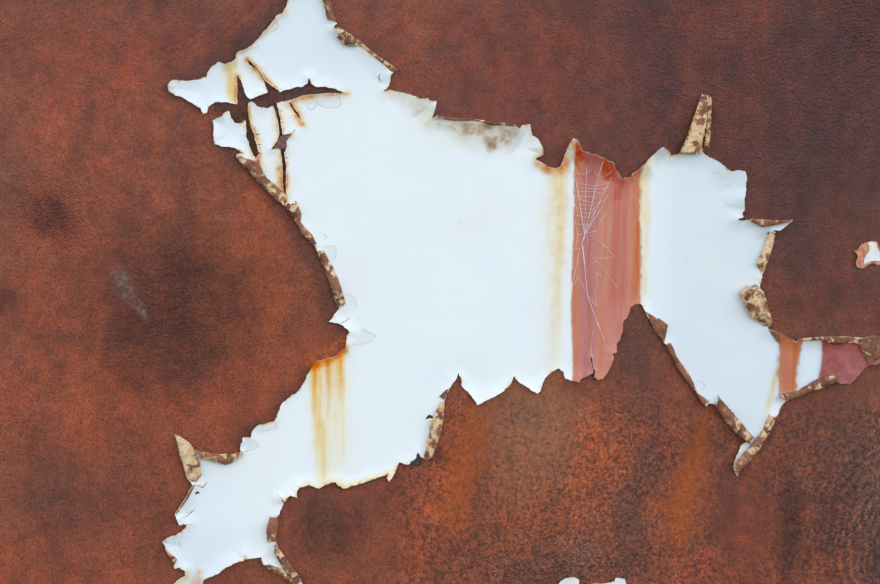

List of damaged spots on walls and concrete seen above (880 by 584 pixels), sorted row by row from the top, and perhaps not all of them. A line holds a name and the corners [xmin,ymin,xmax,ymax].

peeling [162,0,620,584]
rust [572,140,642,382]
peeling [622,94,880,476]
rust [779,334,802,395]
rust [819,339,880,383]